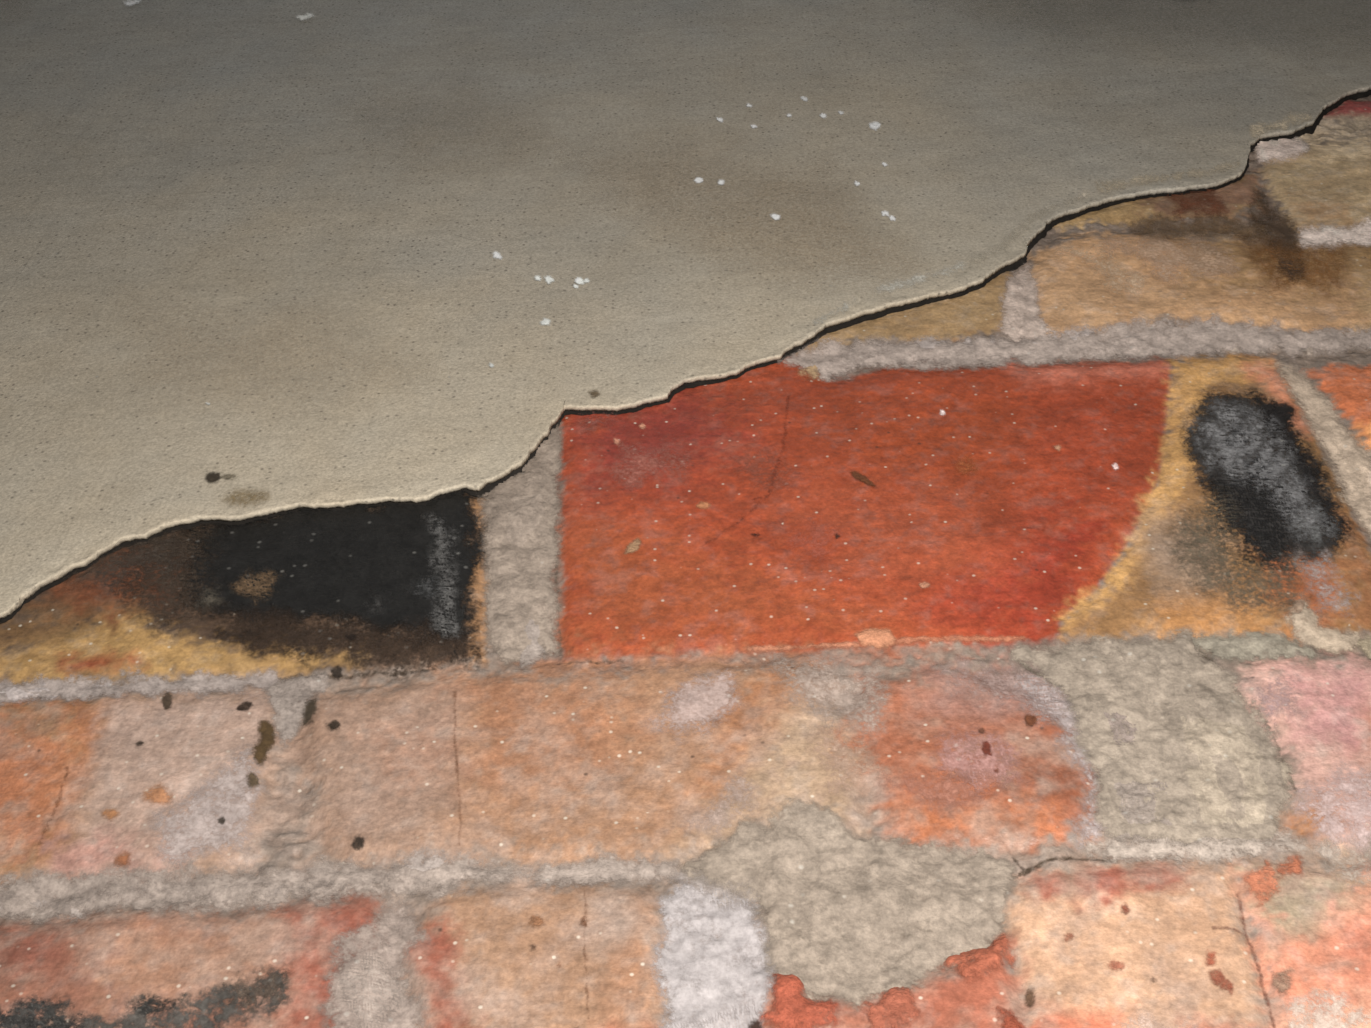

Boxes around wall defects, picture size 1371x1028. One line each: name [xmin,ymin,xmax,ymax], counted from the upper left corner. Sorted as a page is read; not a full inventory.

spalling [206,473,265,504]
water stain [1196,406,1350,608]
water stain [235,572,274,602]
water stain [416,515,459,636]
spalling [747,628,1025,652]
peeling [1192,631,1316,662]
spalling [1244,855,1302,905]
spalling [944,934,1015,982]
spalling [1207,952,1233,991]
spalling [761,973,839,1028]
spalling [861,987,920,1028]
spalling [997,991,1035,1028]